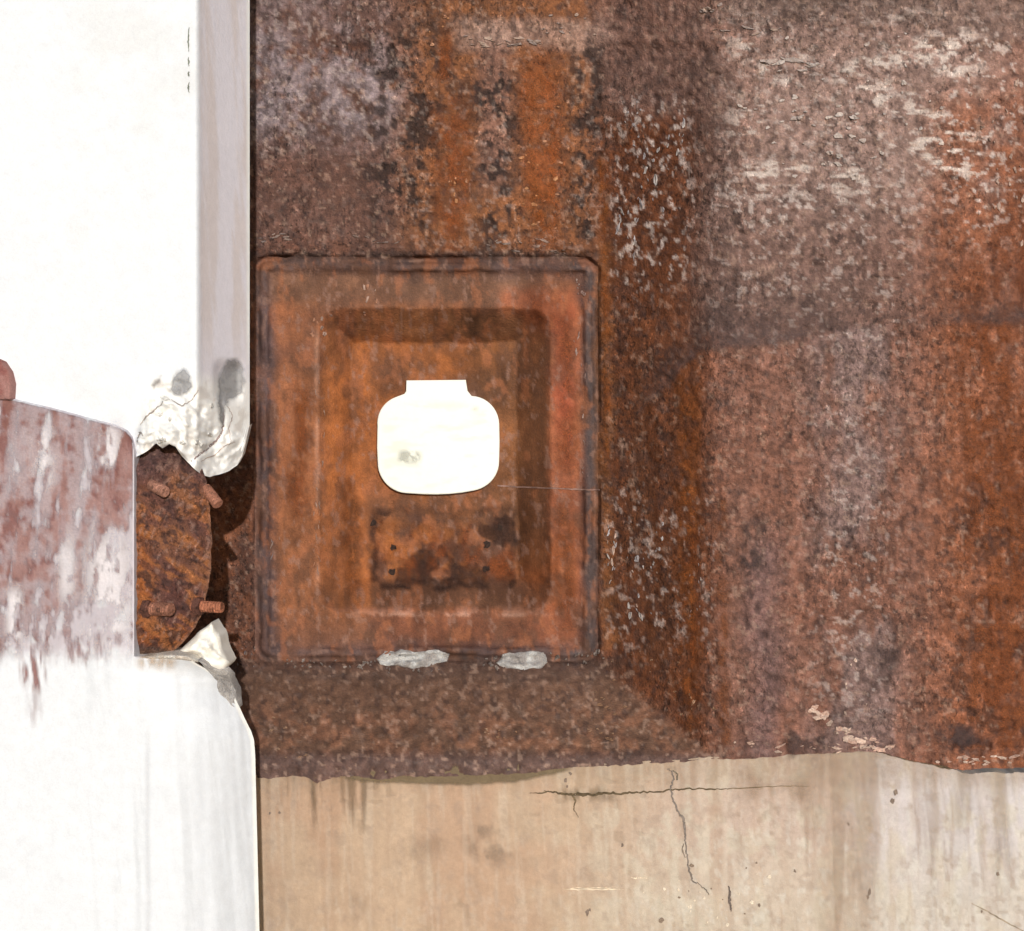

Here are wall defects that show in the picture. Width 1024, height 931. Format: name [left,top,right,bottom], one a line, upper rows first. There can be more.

spalling [179,360,244,462]
rust [372,515,517,591]
crack [535,768,810,911]